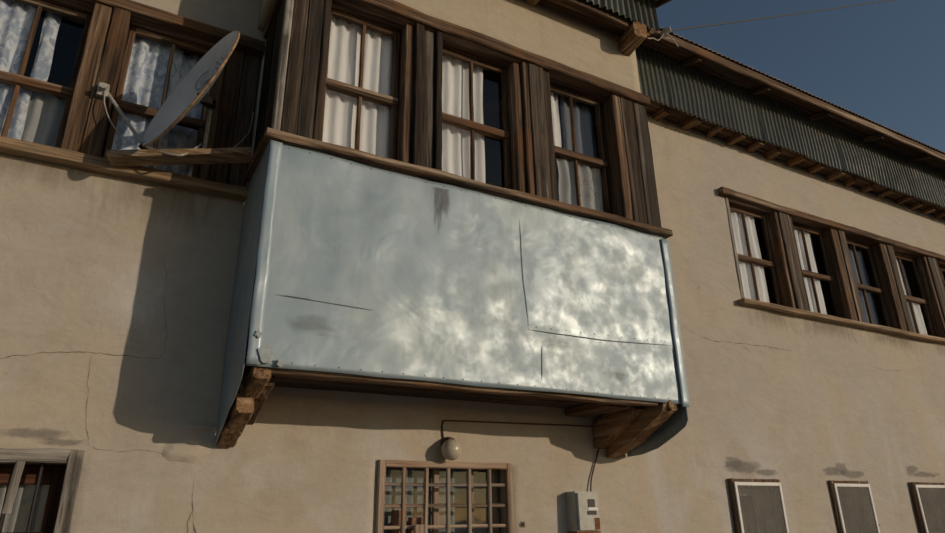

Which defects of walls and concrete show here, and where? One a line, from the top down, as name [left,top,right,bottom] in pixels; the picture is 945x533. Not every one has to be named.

crack [1,266,167,454]